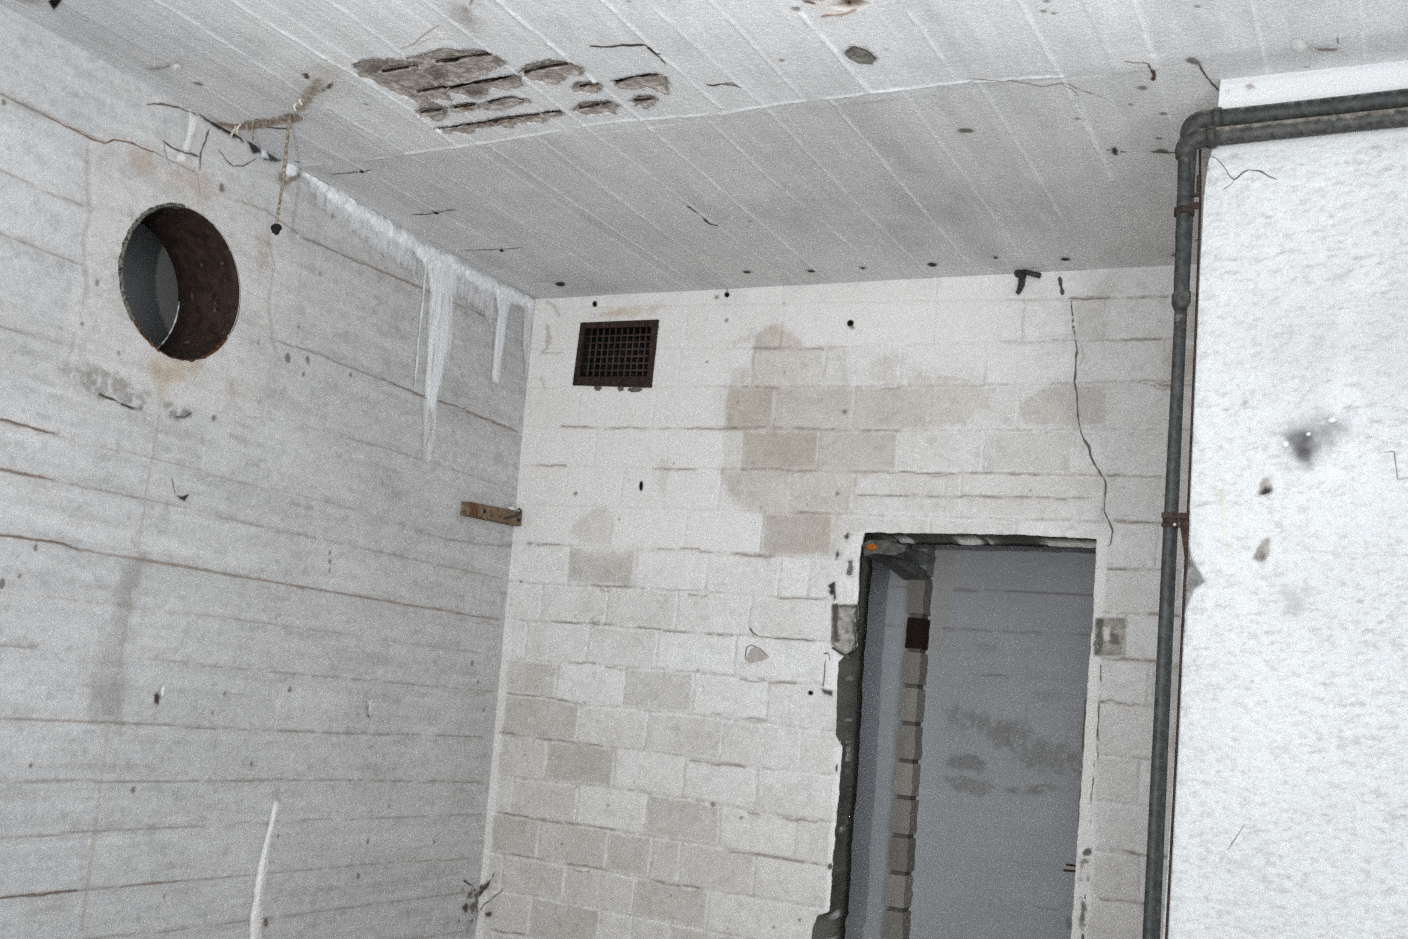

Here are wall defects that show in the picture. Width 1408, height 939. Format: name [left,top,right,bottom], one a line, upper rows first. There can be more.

spalling [349,47,672,135]
leakage [297,169,563,465]
leakage [717,323,993,559]
leakage [1018,378,1108,430]
crack [1057,276,1114,547]
leakage [1057,273,1120,342]